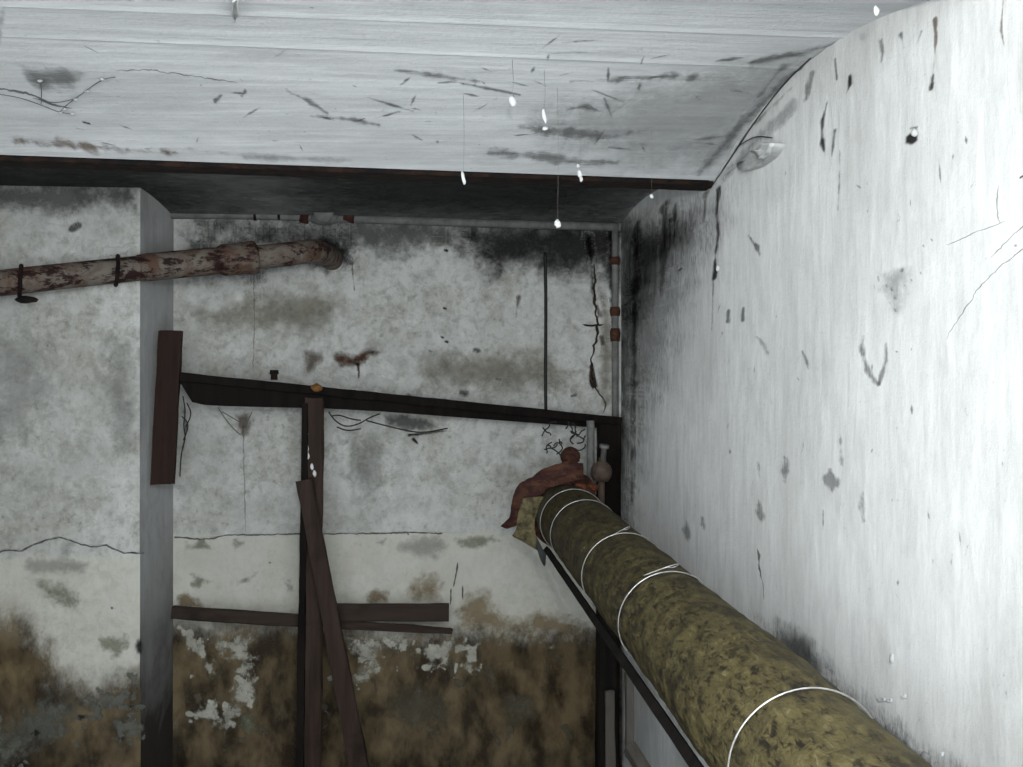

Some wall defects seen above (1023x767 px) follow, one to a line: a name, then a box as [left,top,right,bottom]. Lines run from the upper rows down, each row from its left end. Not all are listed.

water stain [661,202,676,283]
crack [572,265,606,412]
crack [0,537,144,554]
water stain [179,595,200,607]
water stain [0,617,145,767]
water stain [173,623,298,767]
water stain [321,630,349,767]
water stain [342,598,596,767]